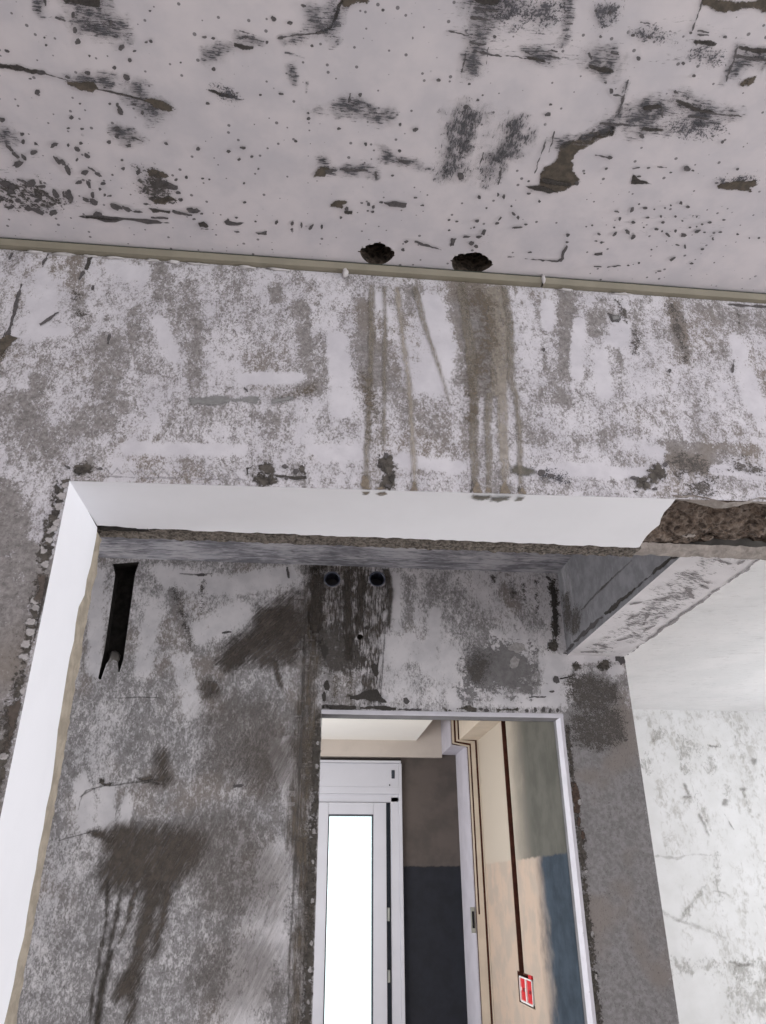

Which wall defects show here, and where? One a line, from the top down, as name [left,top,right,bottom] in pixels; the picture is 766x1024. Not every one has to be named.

peeling [0,115,213,230]
peeling [224,217,278,235]
peeling [358,193,528,266]
peeling [526,117,620,203]
peeling [631,166,694,184]
peeling [715,168,759,192]
water stain [354,286,418,496]
water stain [414,283,573,502]
water stain [139,747,172,787]
water stain [200,565,393,1024]
spalling [0,450,766,1024]
water stain [88,820,207,1024]